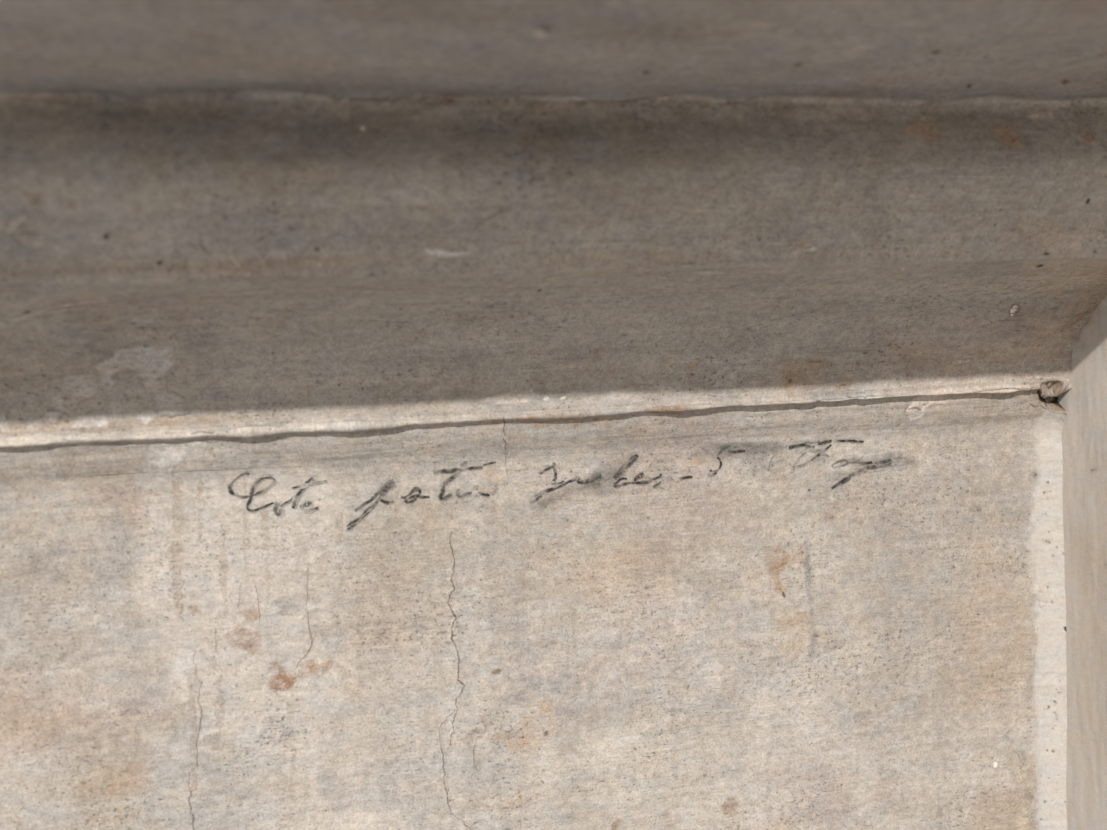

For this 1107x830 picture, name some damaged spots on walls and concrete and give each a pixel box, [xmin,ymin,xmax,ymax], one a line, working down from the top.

crack [436,531,481,830]